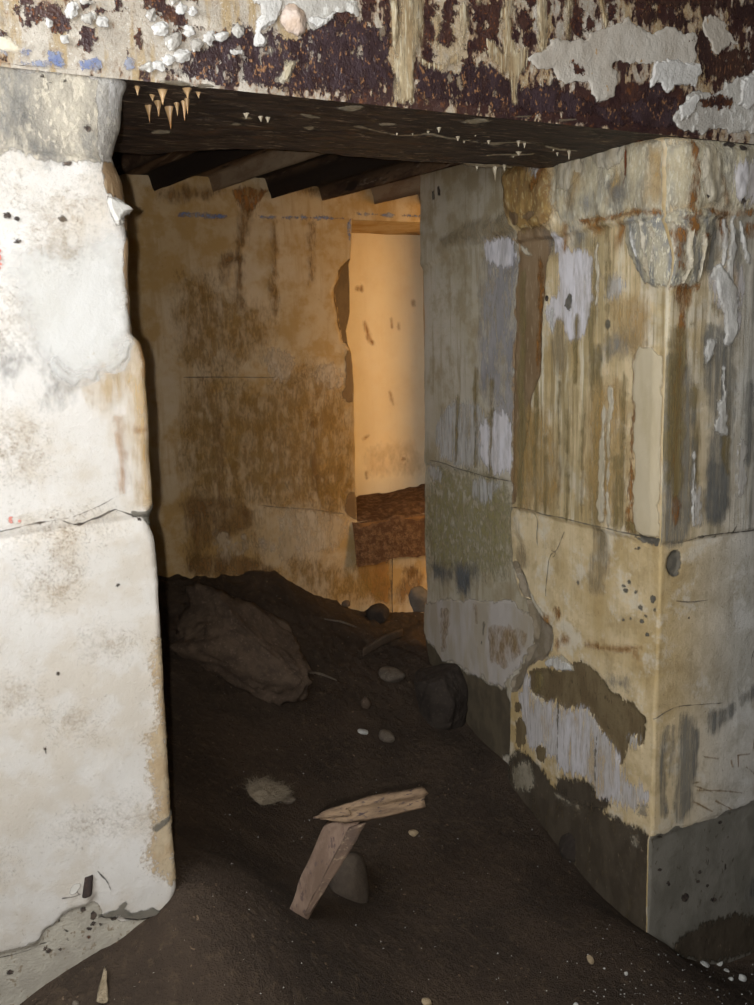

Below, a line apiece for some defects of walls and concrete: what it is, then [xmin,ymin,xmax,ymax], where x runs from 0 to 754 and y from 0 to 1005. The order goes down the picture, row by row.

rust [12,0,129,54]
rust [143,0,400,94]
peeling [253,0,360,51]
rust [415,0,680,130]
peeling [486,14,754,135]
rust [696,29,754,81]
leakage [353,123,754,592]
leakage [128,375,146,464]
crack [0,503,141,532]
peeling [424,561,646,765]
leakage [460,668,754,964]
spalling [0,901,160,1005]